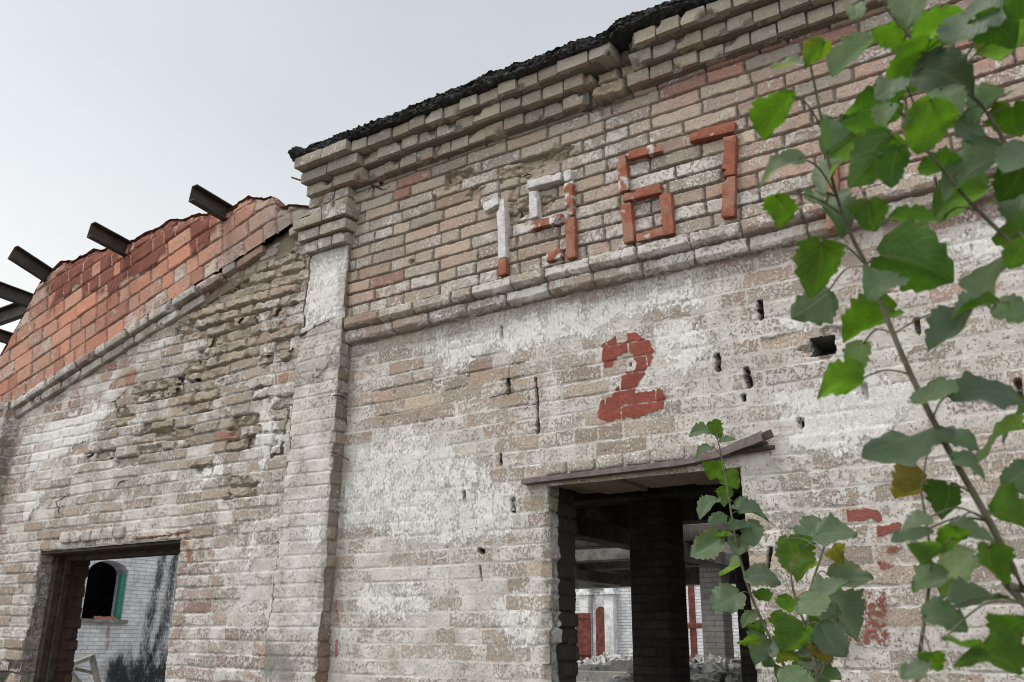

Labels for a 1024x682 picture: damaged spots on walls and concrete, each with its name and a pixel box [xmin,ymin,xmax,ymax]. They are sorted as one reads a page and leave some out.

spalling [127,247,346,449]
crack [489,378,540,430]
peeling [202,379,290,592]
peeling [299,493,330,554]
peeling [843,508,902,570]
peeling [848,592,890,645]